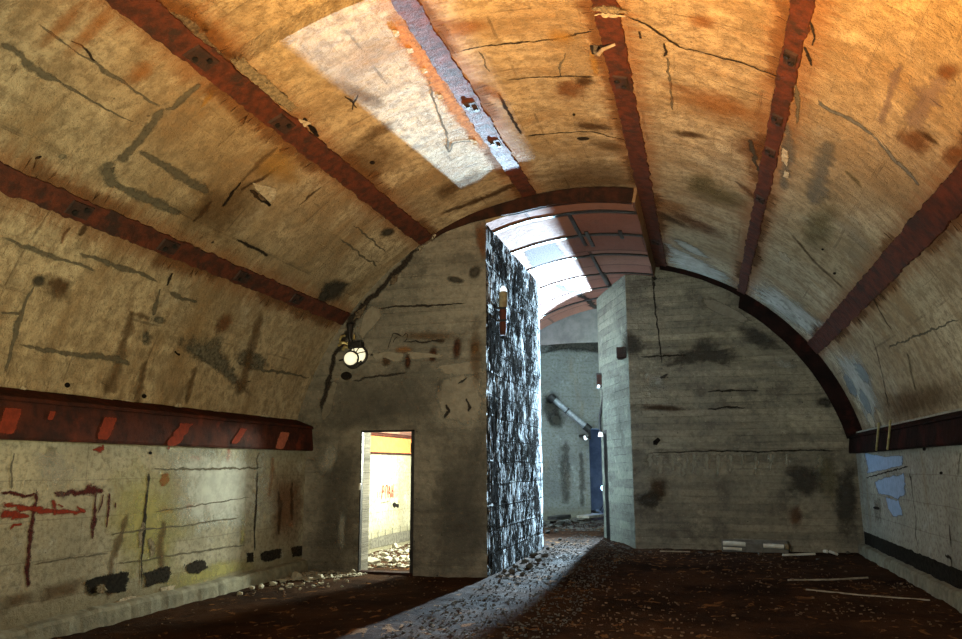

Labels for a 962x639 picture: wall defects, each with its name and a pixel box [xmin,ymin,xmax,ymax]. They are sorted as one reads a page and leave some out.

crack [2,25,209,214]
crack [437,31,620,139]
crack [628,17,919,185]
rust [903,133,937,152]
rust [940,66,955,79]
damp [175,316,309,402]
crack [320,226,464,409]
damp [621,333,641,354]
crack [644,276,684,362]
damp [666,338,735,366]
damp [785,454,857,524]
peeling [865,453,905,517]